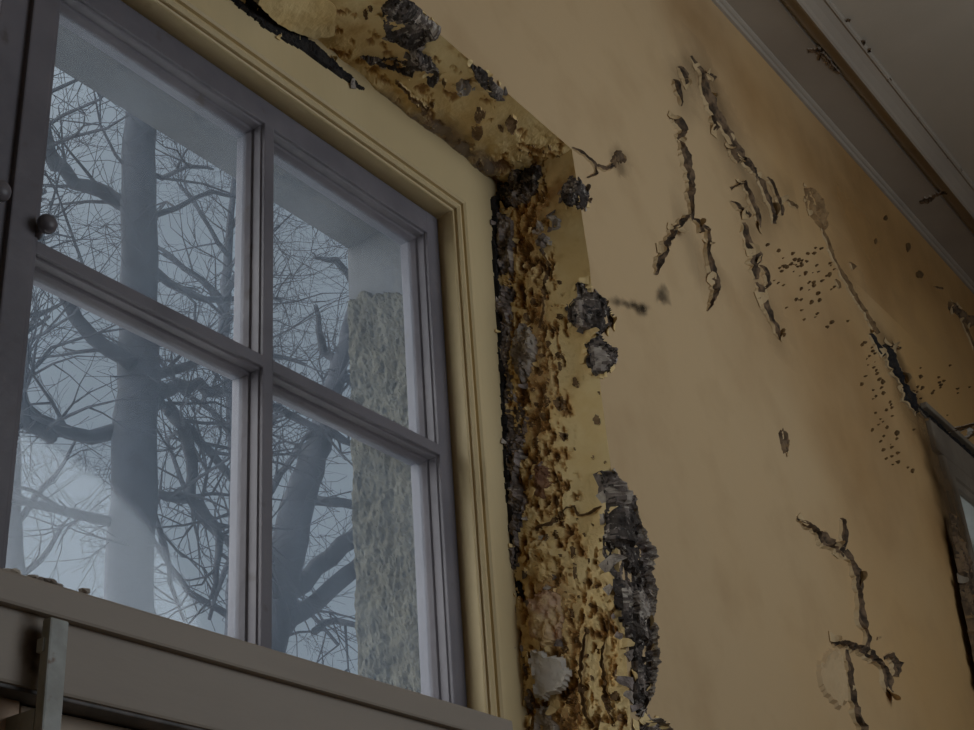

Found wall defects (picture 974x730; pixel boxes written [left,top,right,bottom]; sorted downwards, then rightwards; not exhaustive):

peeling [258,0,336,41]
spalling [360,0,508,101]
peeling [458,106,486,145]
crack [572,147,615,178]
spalling [610,150,627,168]
crack [652,56,799,342]
flaking render [495,144,618,570]
crack [821,229,920,416]
damp [908,367,969,555]
peeling [515,645,594,730]
spalling [552,455,669,730]
crack [796,513,904,730]